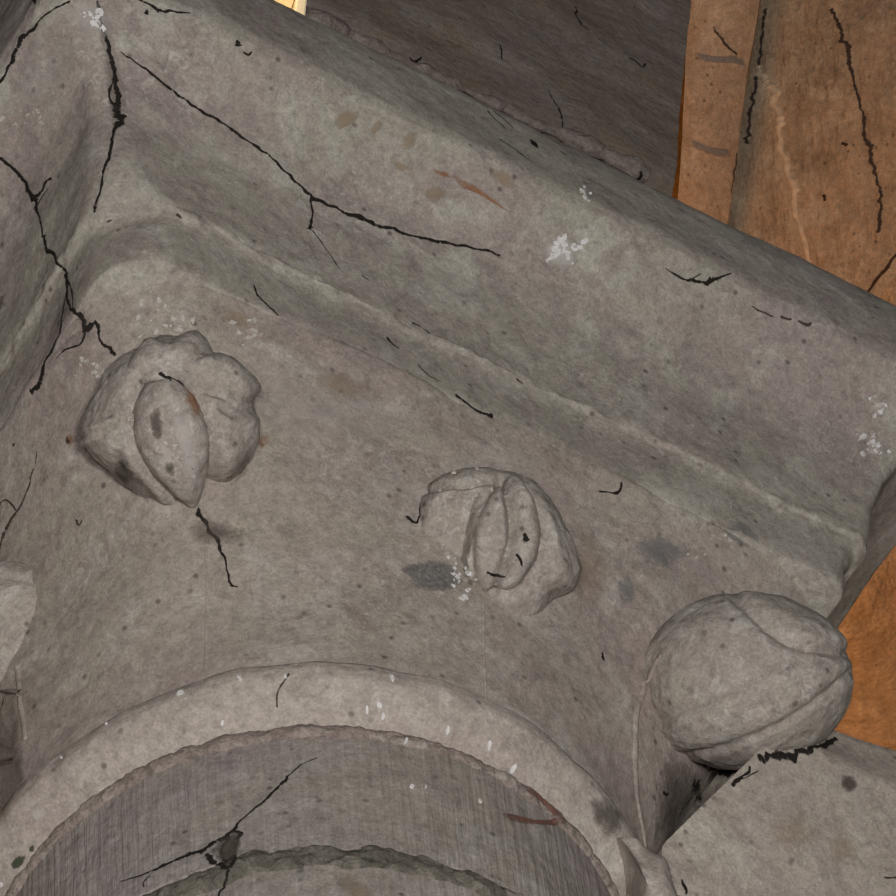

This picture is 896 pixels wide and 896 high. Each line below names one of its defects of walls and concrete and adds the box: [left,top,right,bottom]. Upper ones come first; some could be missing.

crack [0,0,70,83]
crack [93,0,500,269]
crack [829,8,883,233]
crack [0,157,116,395]
crack [867,254,896,293]
crack [196,507,238,587]
crack [120,757,318,896]
crack [663,737,838,814]